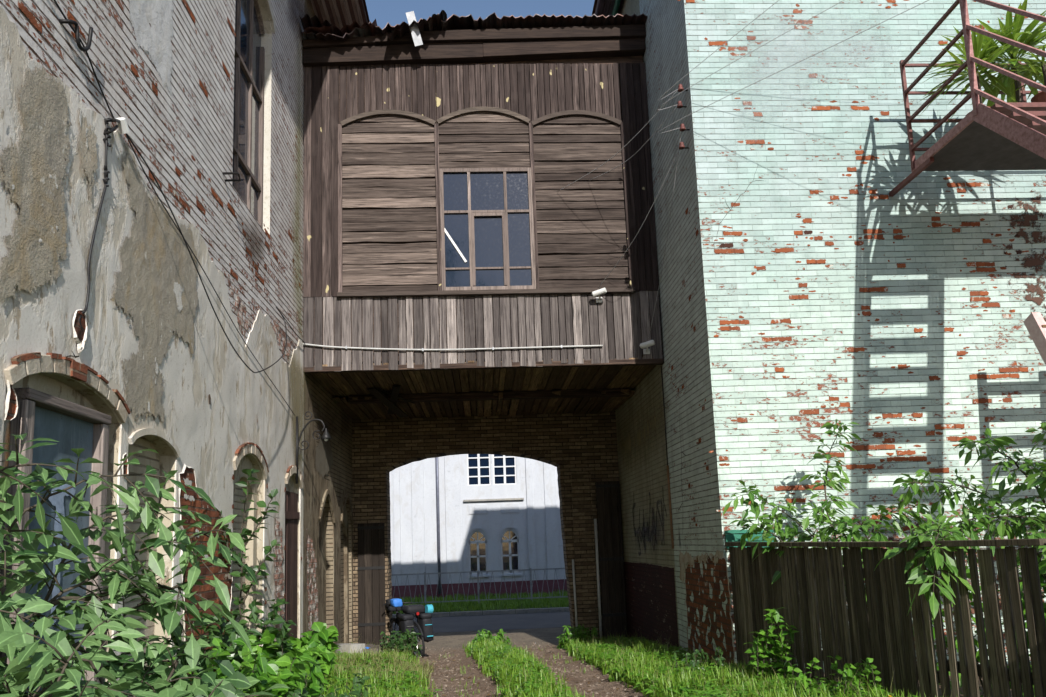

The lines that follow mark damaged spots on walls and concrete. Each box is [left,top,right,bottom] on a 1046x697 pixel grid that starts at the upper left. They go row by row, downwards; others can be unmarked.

spalling [704,31,760,56]
spalling [811,100,889,121]
peeling [0,65,98,303]
spalling [808,145,889,205]
peeling [11,143,296,423]
spalling [694,226,748,254]
spalling [751,213,839,305]
peeling [927,182,1046,320]
spalling [714,316,795,347]
spalling [793,396,853,420]
flaking render [179,464,234,672]
flaking render [679,550,735,664]